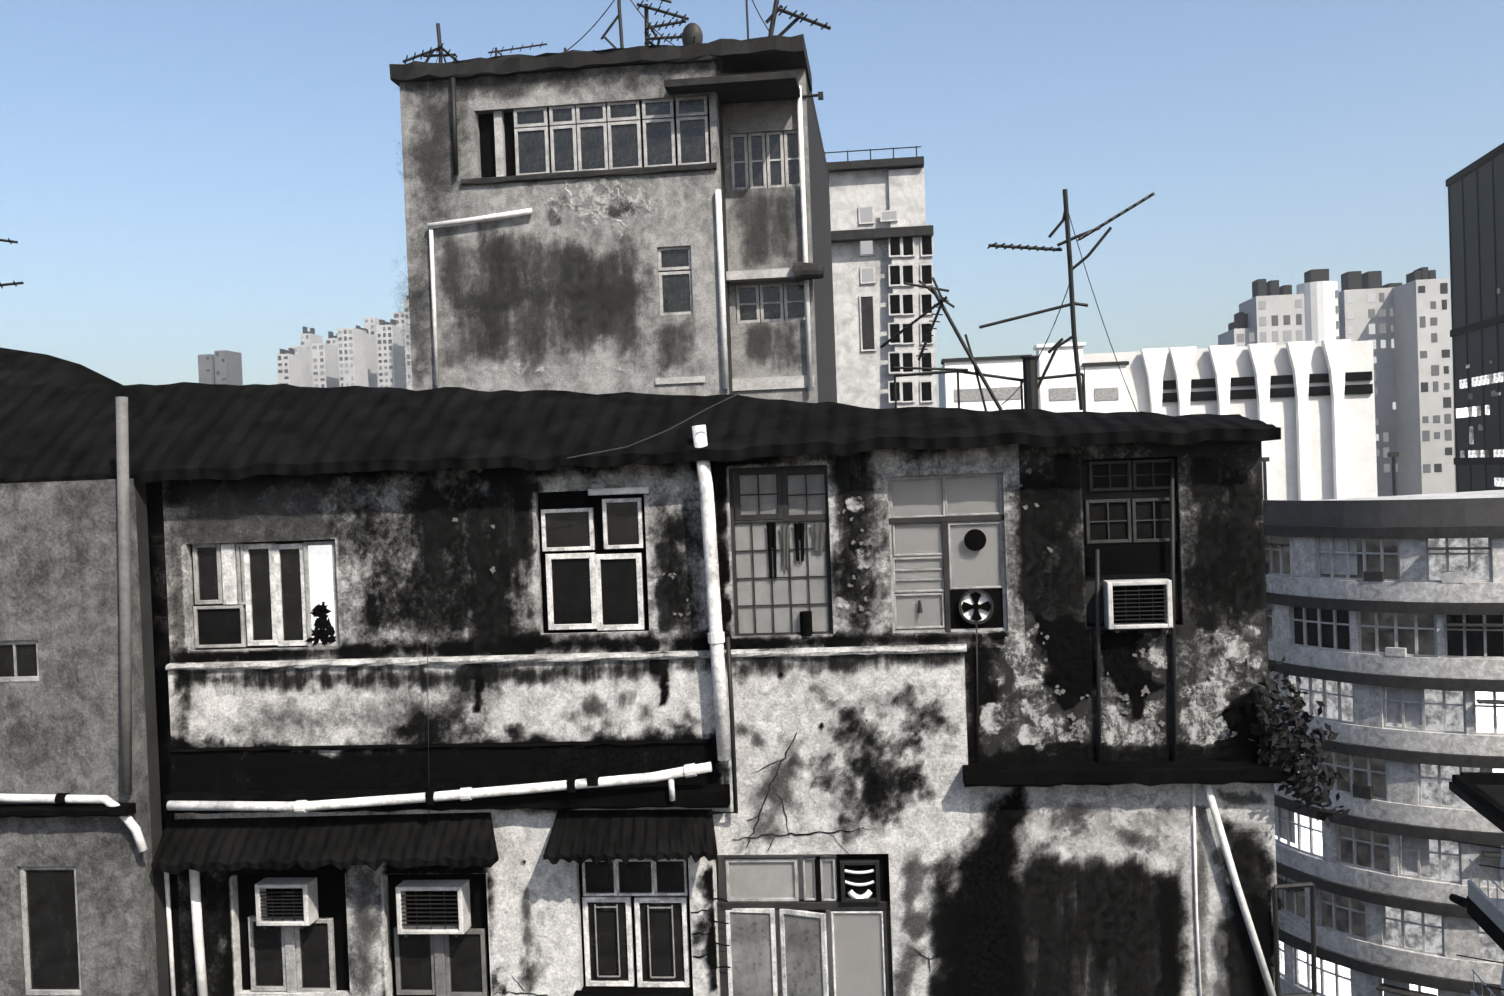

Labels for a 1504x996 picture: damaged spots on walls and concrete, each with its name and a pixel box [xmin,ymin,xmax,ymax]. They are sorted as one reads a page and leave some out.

water stain [441,225,652,378]
water stain [738,188,799,268]
water stain [746,322,807,366]
water stain [163,448,1267,842]
crack [732,733,870,856]
water stain [895,786,1191,996]